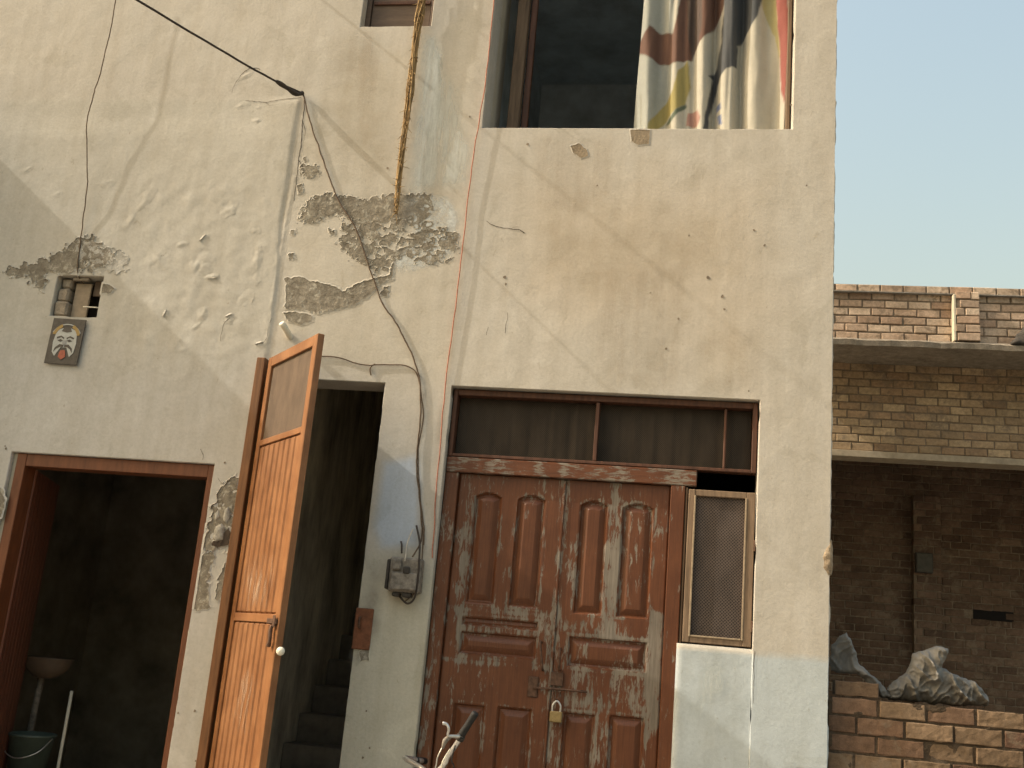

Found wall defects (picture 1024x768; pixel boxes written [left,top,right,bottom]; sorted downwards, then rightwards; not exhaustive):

flaking render [569,142,590,160]
flaking render [629,128,651,146]
flaking render [2,233,130,296]
peeling [282,155,460,326]
flaking render [192,472,239,613]